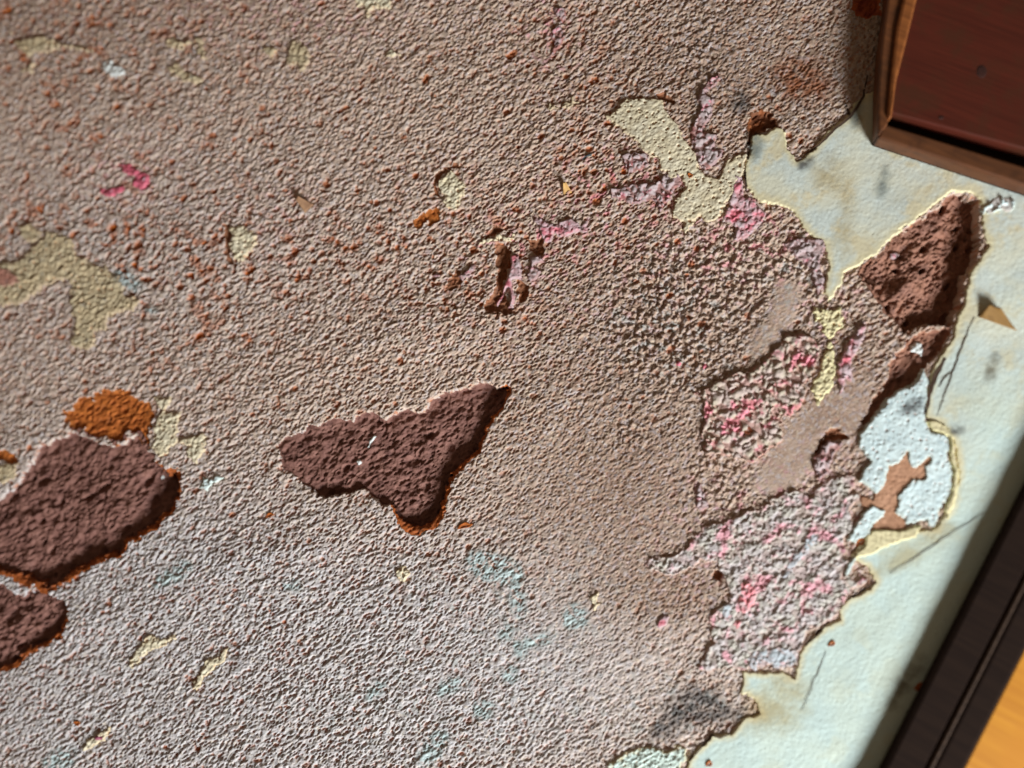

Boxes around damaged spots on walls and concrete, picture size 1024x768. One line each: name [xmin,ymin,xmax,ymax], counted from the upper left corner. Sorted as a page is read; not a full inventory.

spalling [478,225,529,316]
peeling [605,91,1024,768]